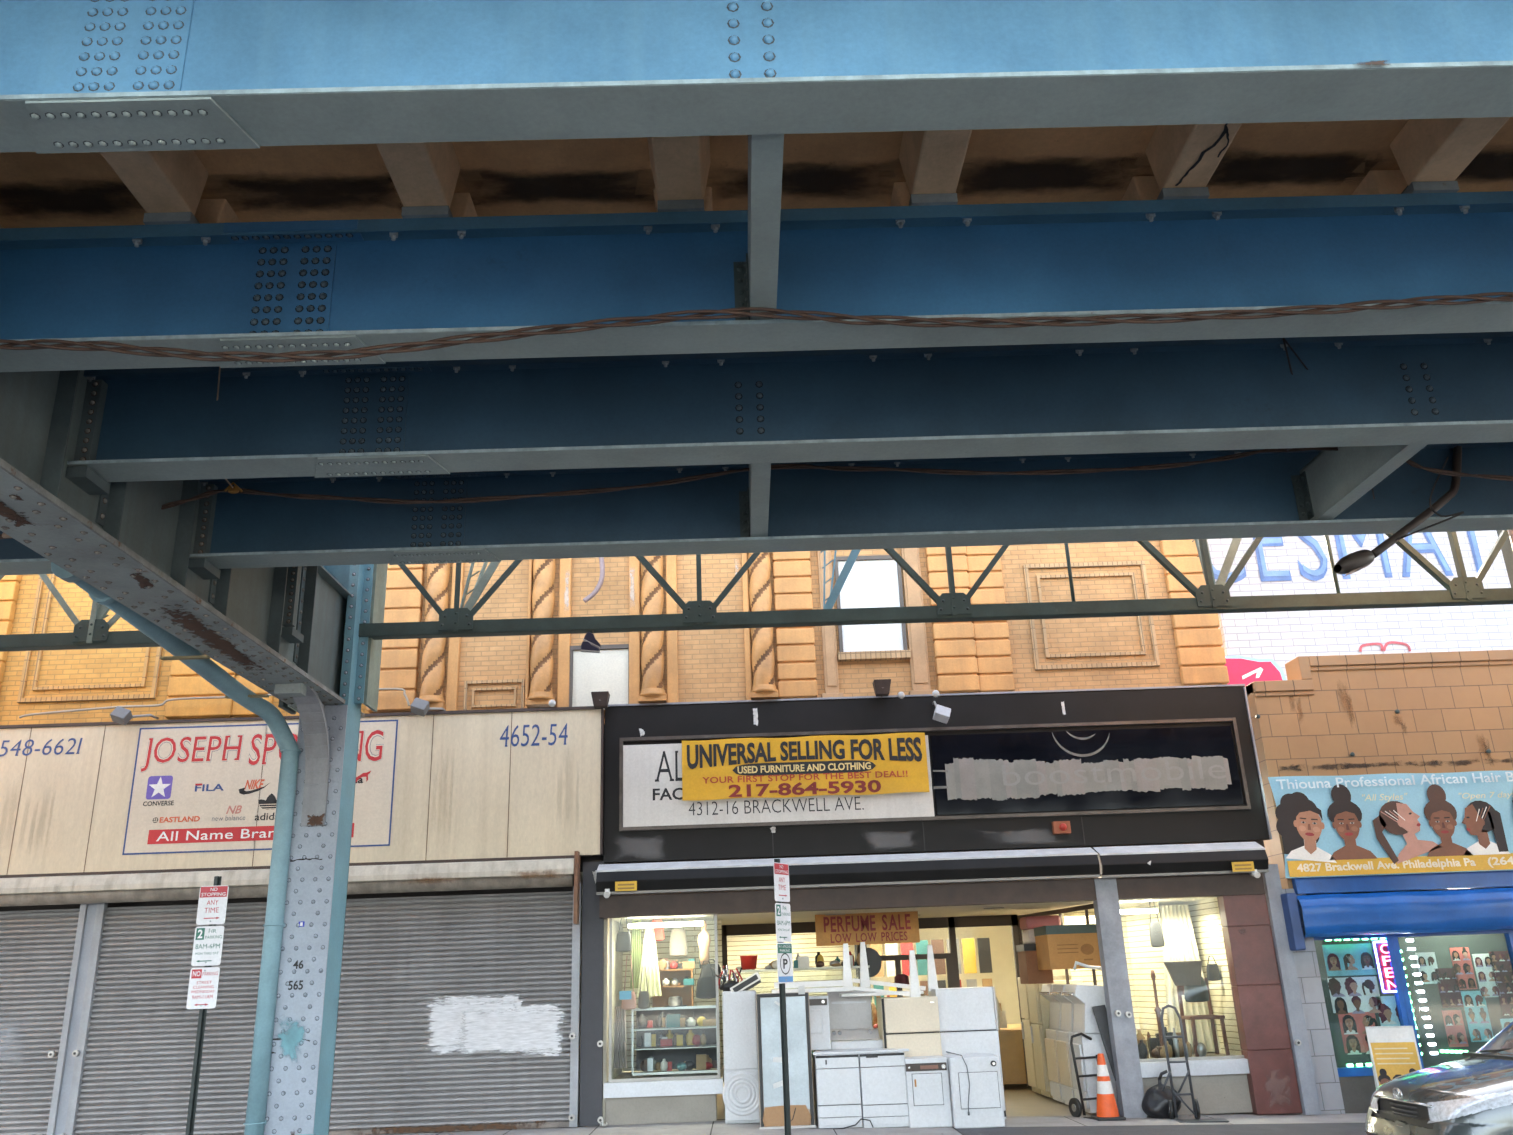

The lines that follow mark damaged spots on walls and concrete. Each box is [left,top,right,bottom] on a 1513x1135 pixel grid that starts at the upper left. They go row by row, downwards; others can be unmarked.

crack [1175,124,1229,186]
corrosion [0,502,33,527]
corrosion [130,573,154,589]
corrosion [160,605,271,674]